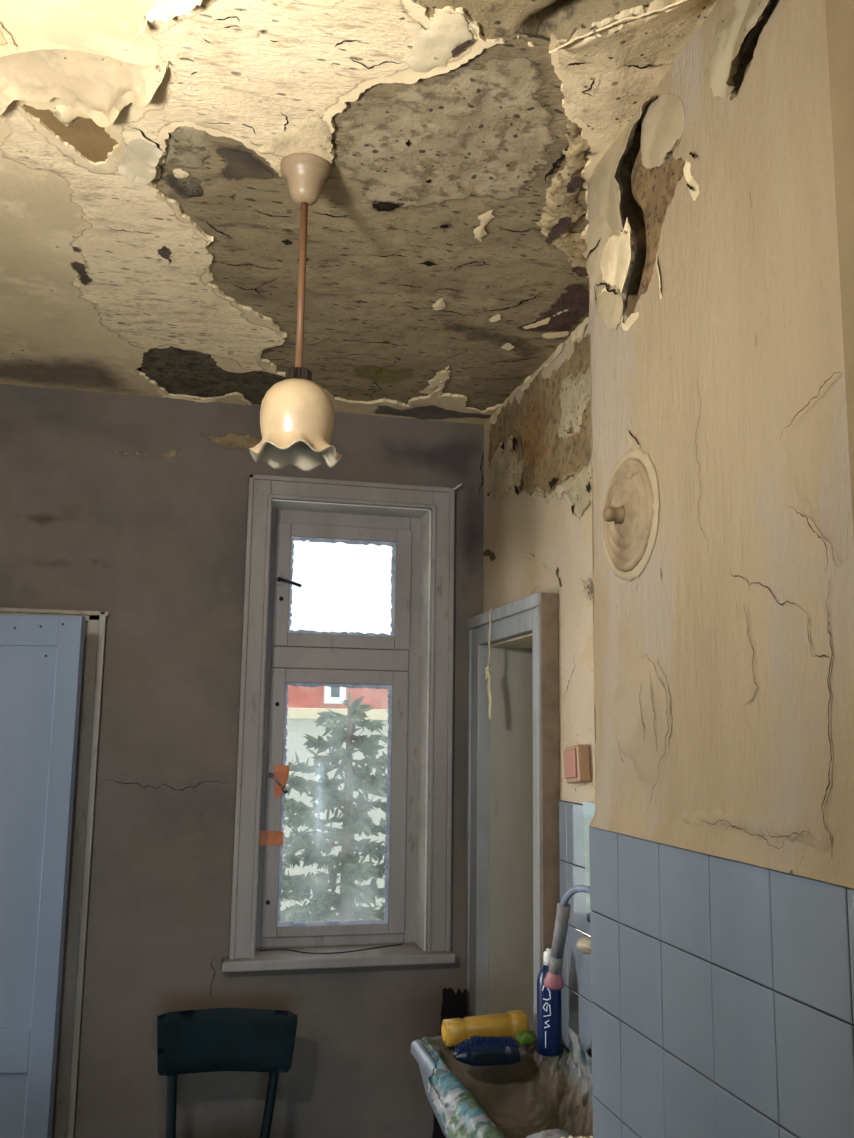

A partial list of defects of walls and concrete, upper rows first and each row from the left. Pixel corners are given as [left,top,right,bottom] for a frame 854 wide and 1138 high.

flaking render [0,0,778,519]
leakage [0,363,115,387]
crack [101,779,227,791]
crack [639,654,669,802]
crack [730,571,833,850]